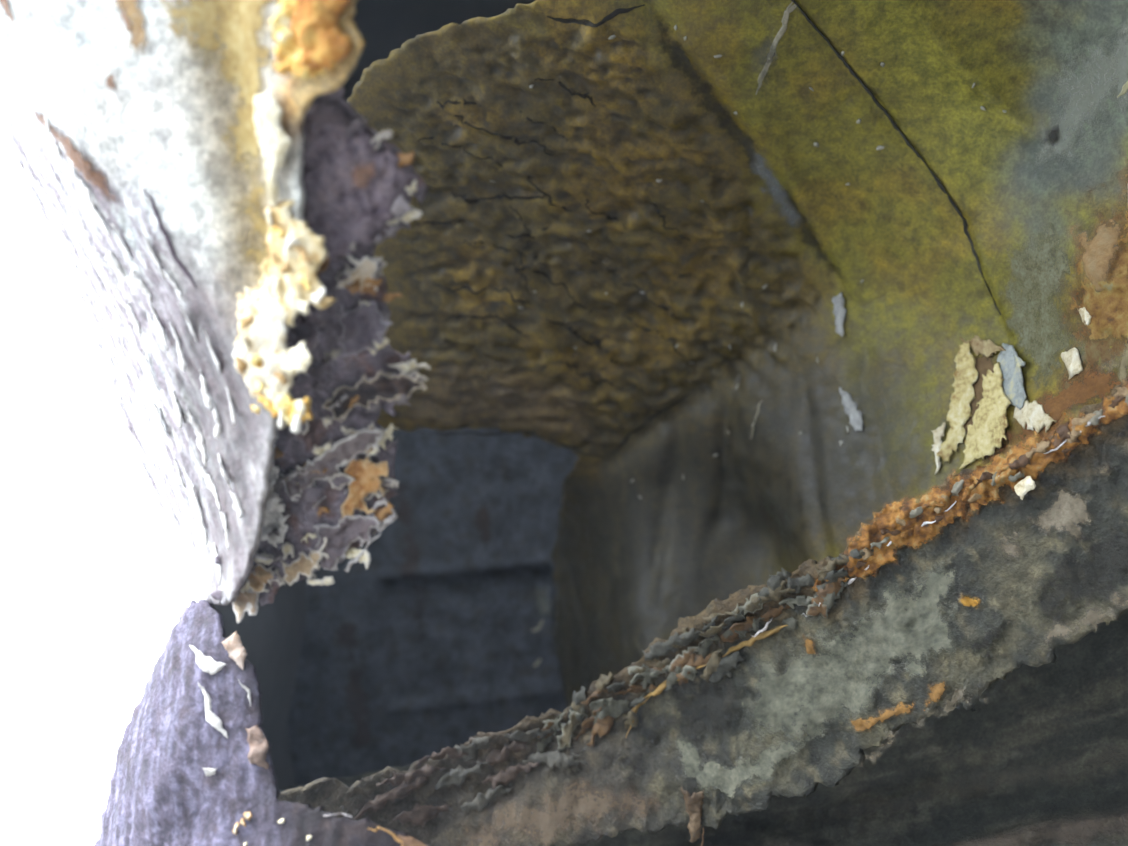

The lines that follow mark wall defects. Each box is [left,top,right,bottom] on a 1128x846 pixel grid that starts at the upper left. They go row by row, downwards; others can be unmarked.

corrosion [116,0,148,54]
corrosion [160,0,365,265]
crack [547,4,834,272]
crack [791,0,1001,315]
corrosion [1044,125,1059,145]
leakage [1037,26,1128,162]
peeling [44,115,243,590]
peeling [189,91,431,739]
corrosion [812,168,1128,607]
peeling [931,335,1057,474]
peeling [245,725,269,769]
corrosion [397,834,427,846]